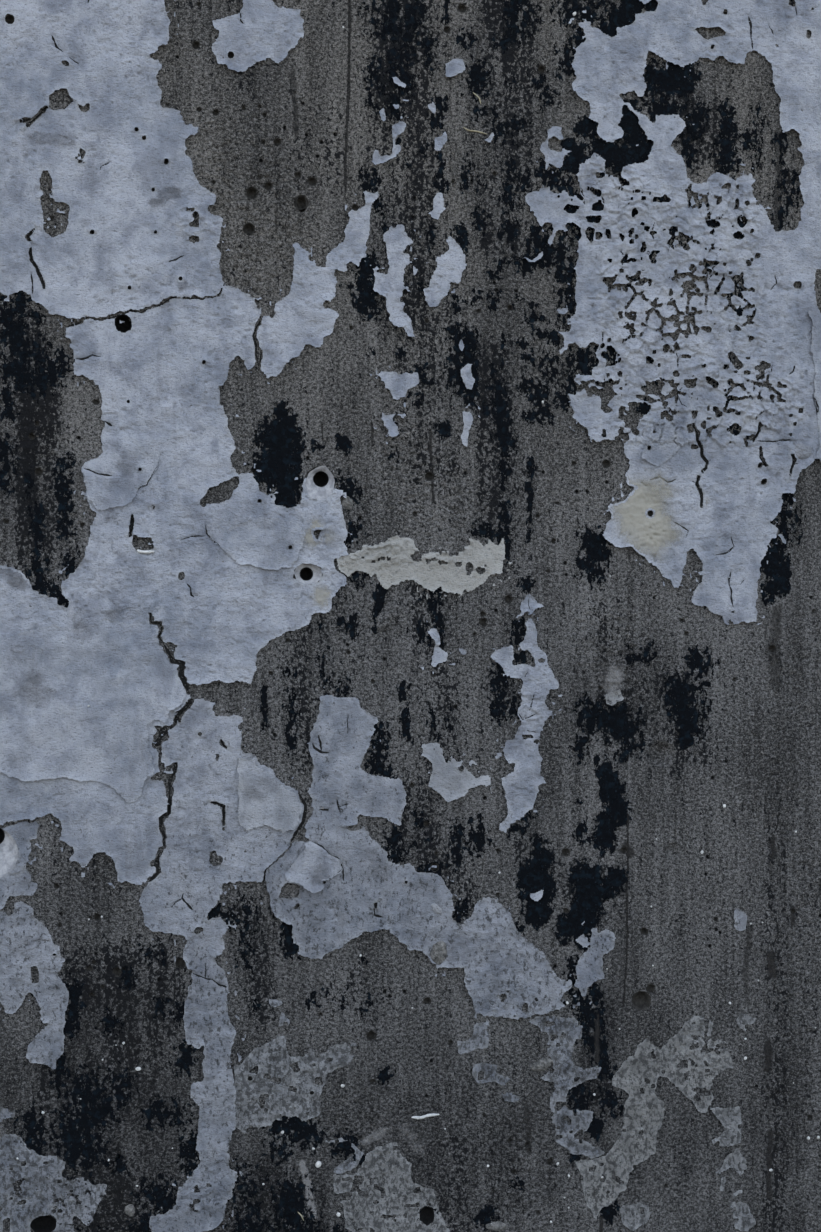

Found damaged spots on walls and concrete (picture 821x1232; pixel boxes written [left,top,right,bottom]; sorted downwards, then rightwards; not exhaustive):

crack [67,285,224,327]
peeling [524,0,821,629]
peeling [0,0,572,1232]
peeling [605,689,624,706]
crack [149,613,192,882]
peeling [734,908,763,931]
peeling [573,928,616,997]
peeling [729,1002,755,1040]
peeling [529,1015,733,1219]
peeling [711,1106,747,1191]
peeling [620,1203,652,1231]
peeling [729,1190,756,1232]